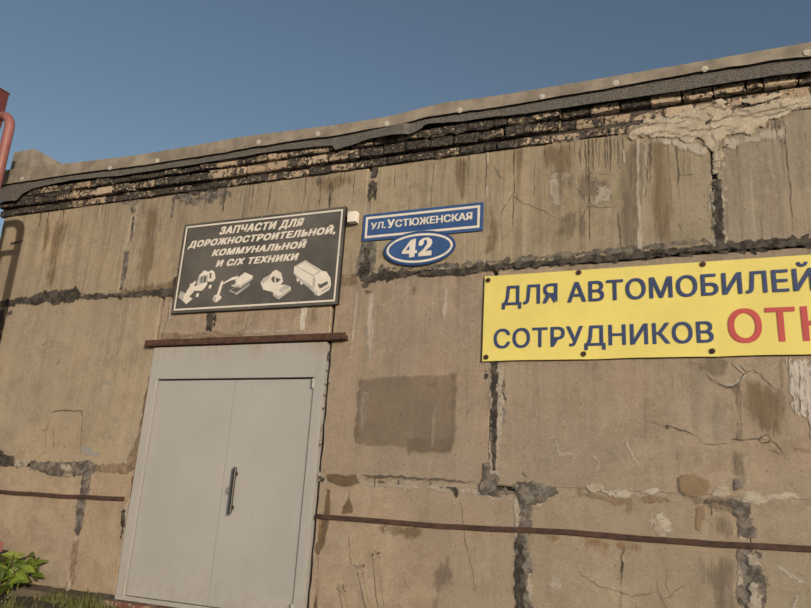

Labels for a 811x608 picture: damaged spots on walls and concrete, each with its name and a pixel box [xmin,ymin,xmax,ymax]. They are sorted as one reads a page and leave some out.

peeling [628,92,811,173]
leakage [342,117,811,360]
crack [707,360,780,391]
peeling [786,356,811,437]
crack [734,434,787,461]
crack [619,547,627,587]